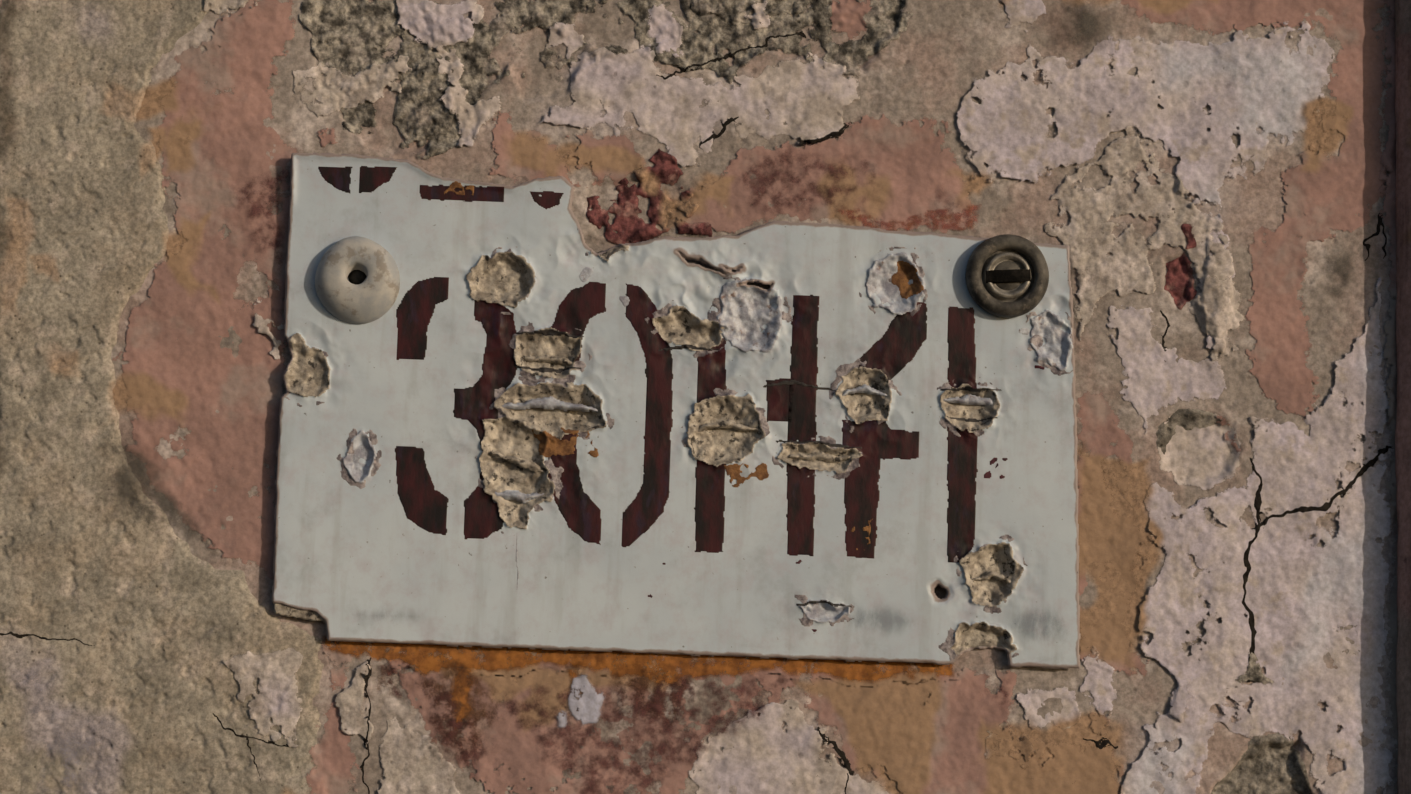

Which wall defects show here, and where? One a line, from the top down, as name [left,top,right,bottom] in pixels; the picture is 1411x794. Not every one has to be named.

peeling [113,0,976,580]
flaking render [377,0,1393,794]
crack [1242,446,1394,682]
flaking render [222,647,304,748]
peeling [306,642,374,794]
crack [360,657,372,794]
rust [324,636,953,794]
crack [817,727,854,794]